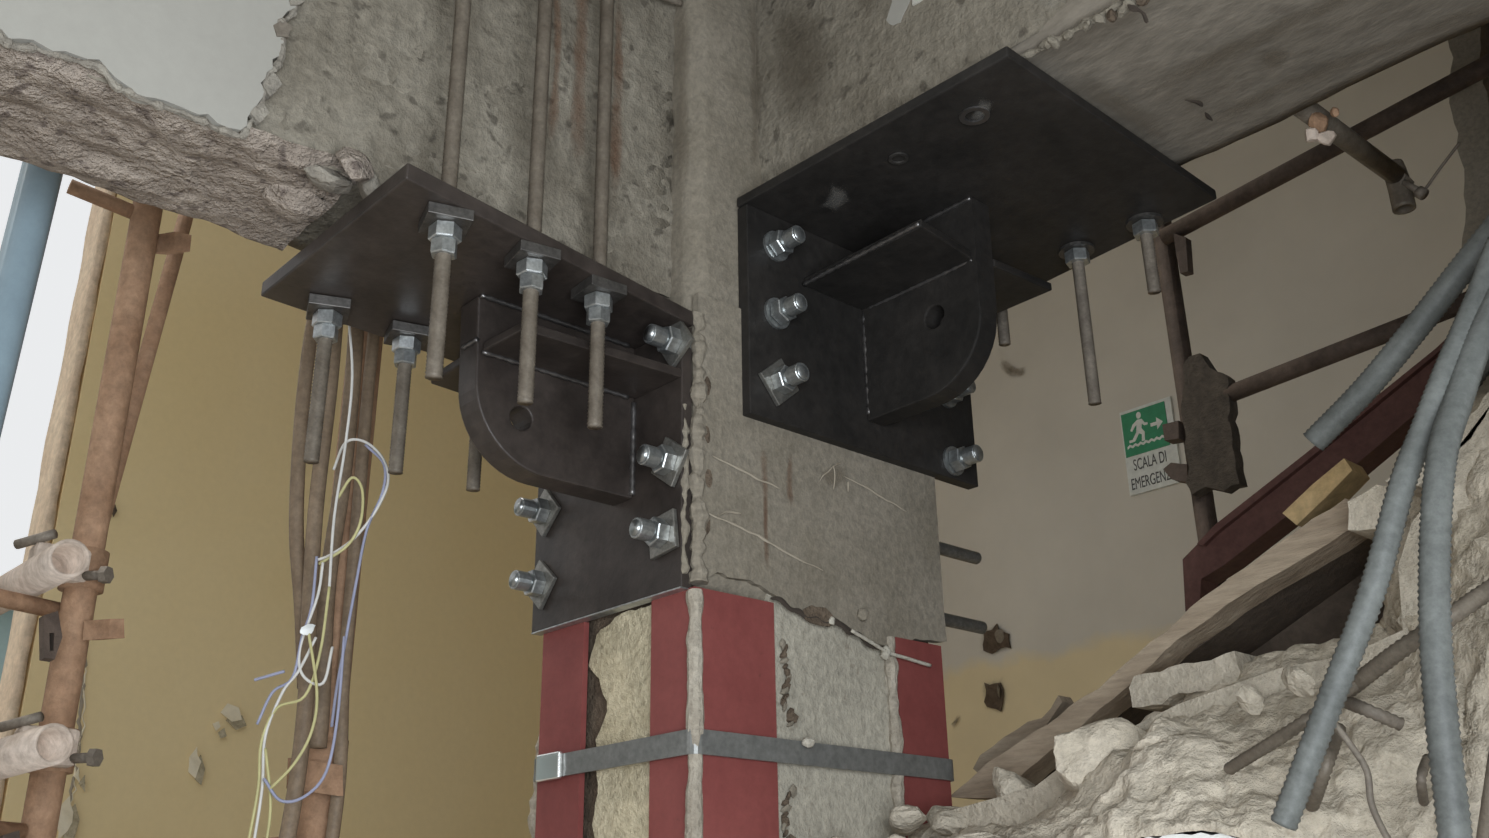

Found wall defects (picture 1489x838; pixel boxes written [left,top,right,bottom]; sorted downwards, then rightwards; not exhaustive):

flaking render [886,0,923,26]
spalling [1470,376,1489,414]
spalling [908,496,1438,838]
spalling [1450,447,1489,838]